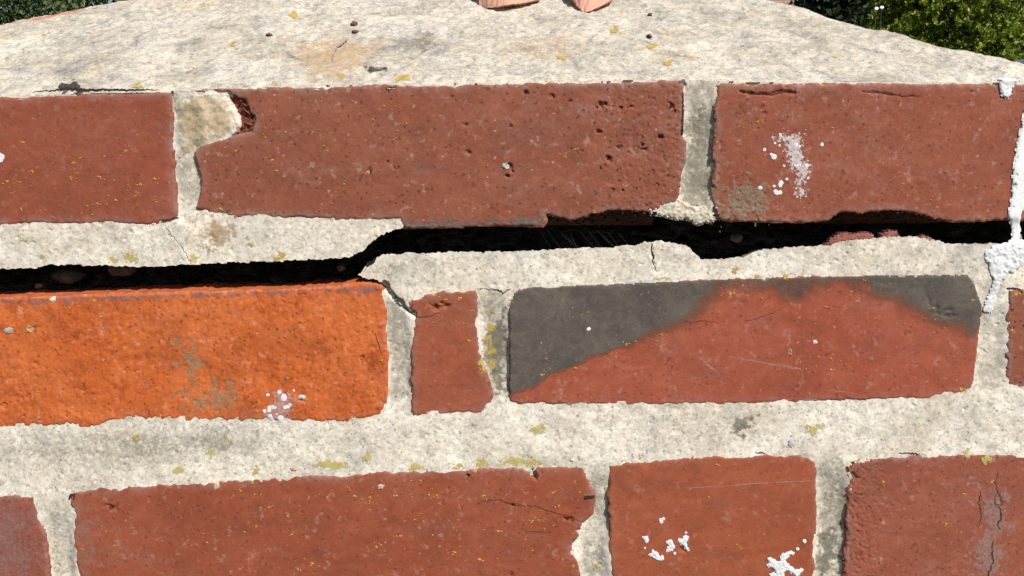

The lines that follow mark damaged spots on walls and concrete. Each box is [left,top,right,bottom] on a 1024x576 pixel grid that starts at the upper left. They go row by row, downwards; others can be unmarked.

spalling [180,94,256,152]
crack [0,206,1024,318]
crack [978,473,1004,576]